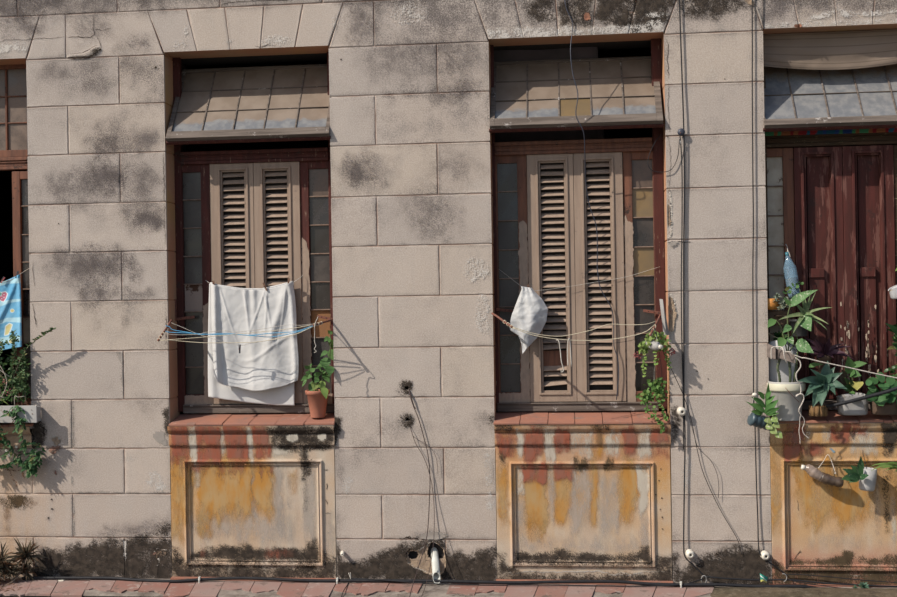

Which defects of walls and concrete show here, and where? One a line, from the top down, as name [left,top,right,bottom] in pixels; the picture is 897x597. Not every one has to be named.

leakage [487,0,746,39]
leakage [53,250,119,280]
peeling [840,320,888,381]
leakage [16,421,47,455]
leakage [0,495,29,508]
leakage [33,416,897,585]
flaking render [406,531,448,576]